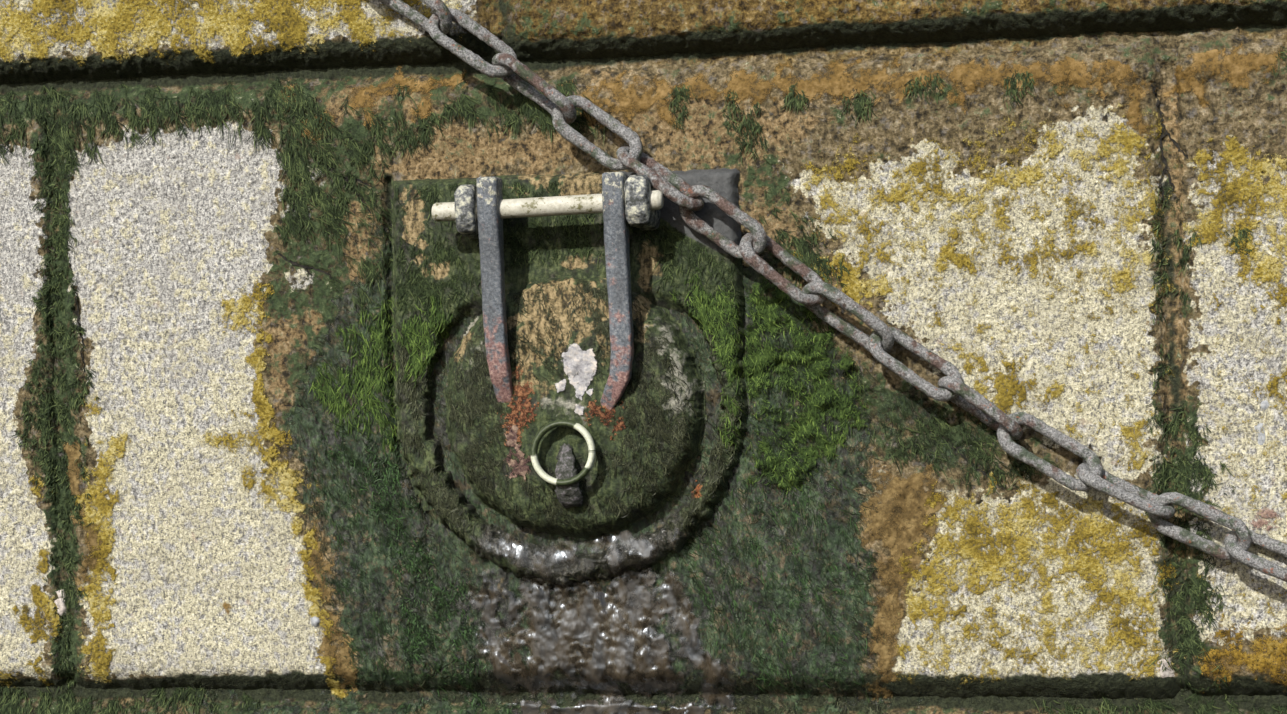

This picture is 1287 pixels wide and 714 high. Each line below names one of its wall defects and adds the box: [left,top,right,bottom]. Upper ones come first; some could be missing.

corrosion [497,365,539,480]
corrosion [584,400,626,440]
damp [453,567,750,714]